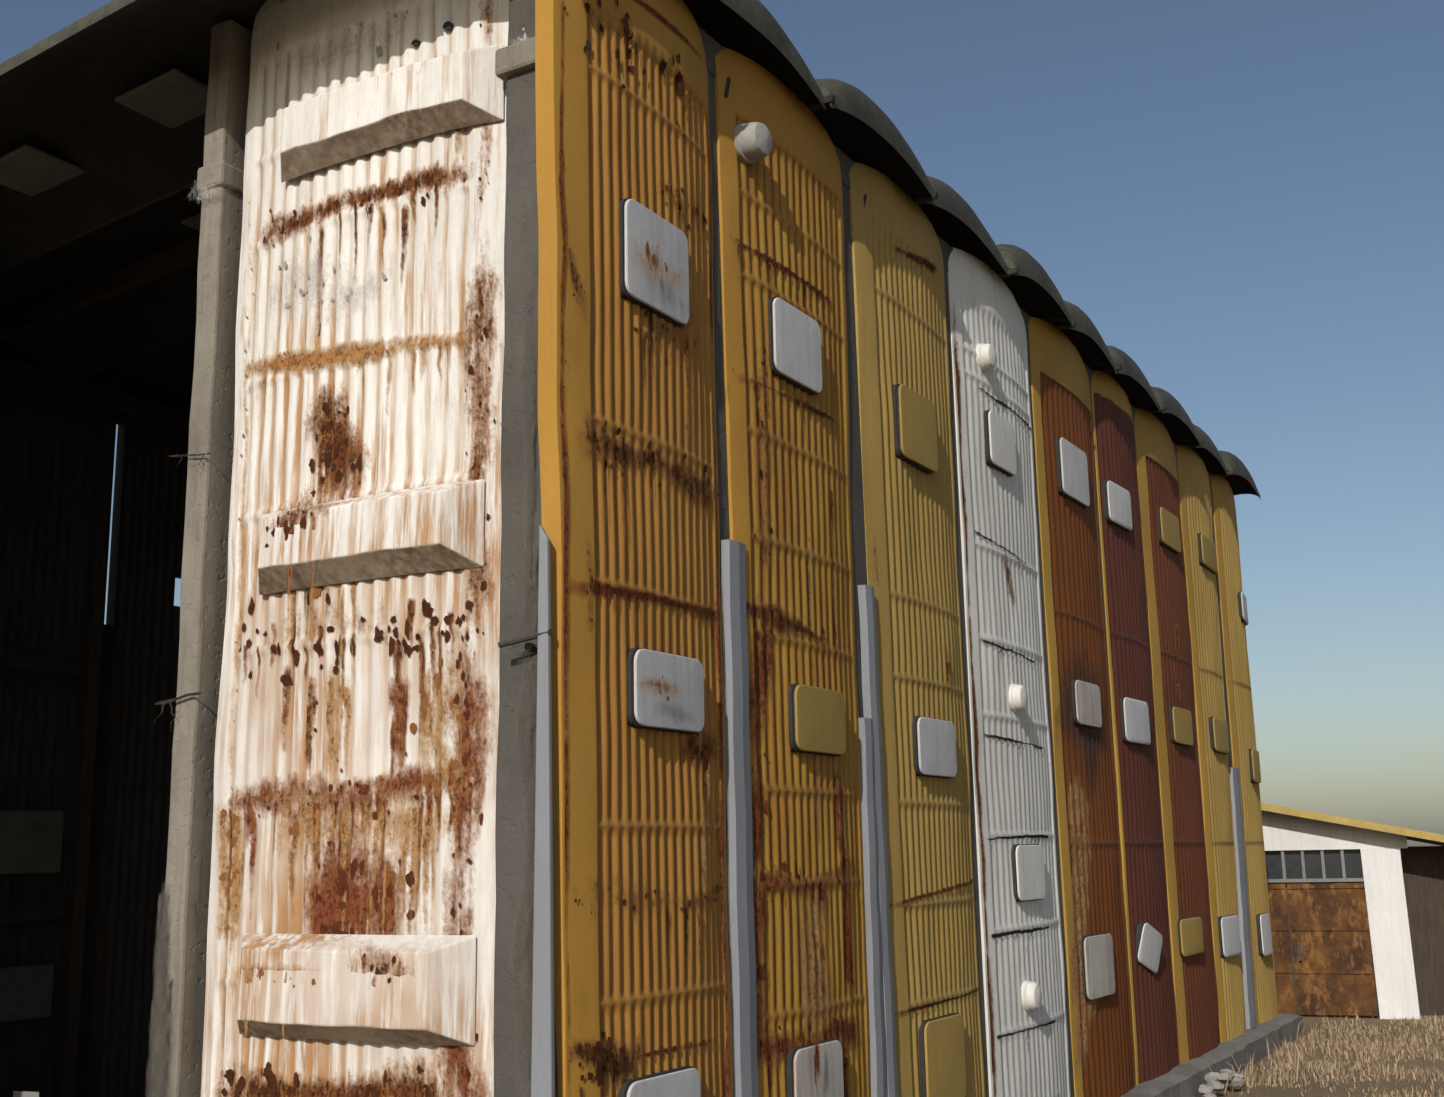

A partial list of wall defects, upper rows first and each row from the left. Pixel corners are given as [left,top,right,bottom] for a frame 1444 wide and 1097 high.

corrosion [238,267,498,562]
corrosion [248,123,490,318]
corrosion [559,0,730,1097]
corrosion [731,236,832,310]
corrosion [733,347,834,570]
corrosion [217,547,494,988]
corrosion [746,489,860,1097]
corrosion [218,1033,486,1097]